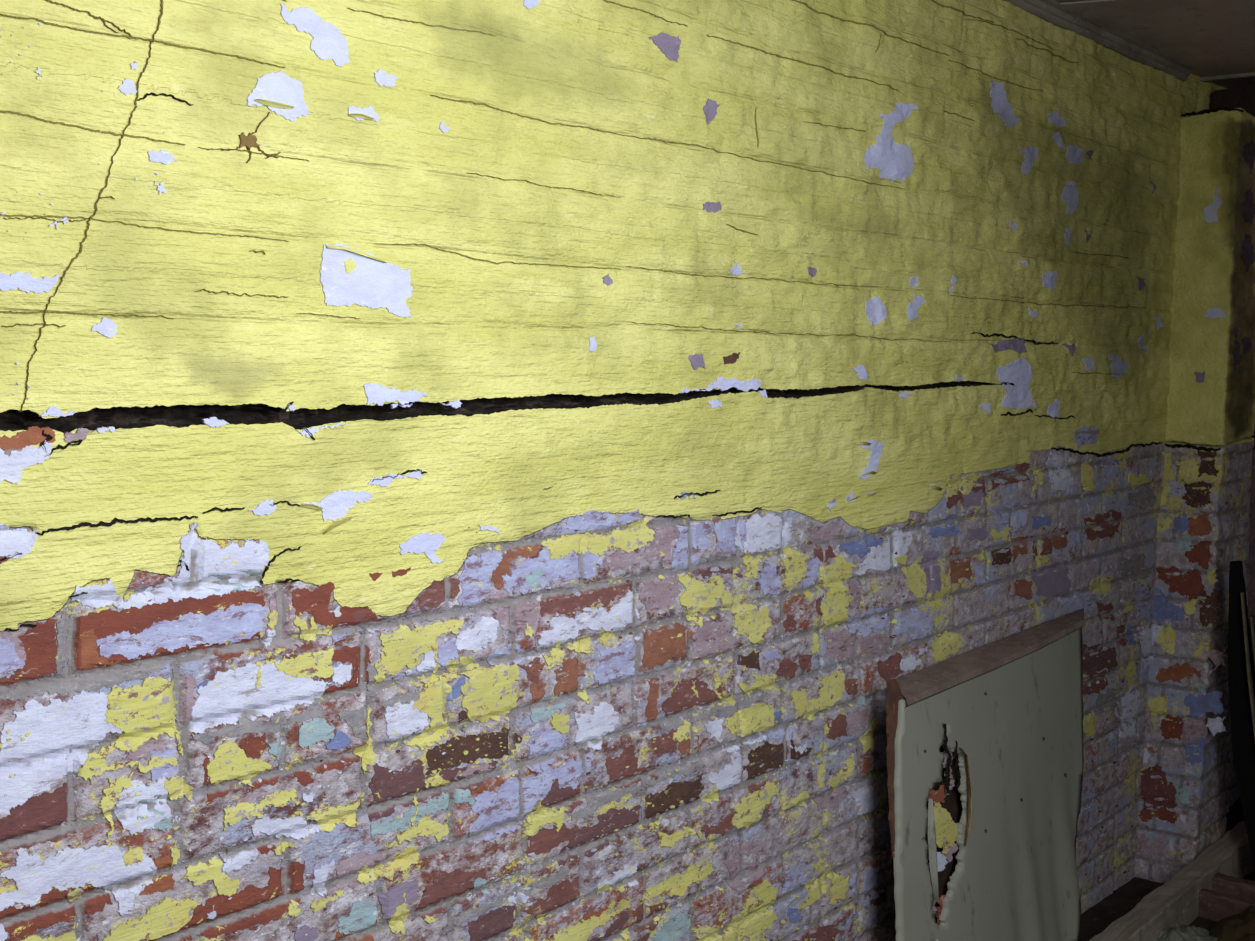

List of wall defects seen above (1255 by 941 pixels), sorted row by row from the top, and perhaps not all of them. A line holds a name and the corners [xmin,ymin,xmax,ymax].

peeling [280,4,349,67]
peeling [247,71,311,121]
peeling [989,81,1020,128]
peeling [864,102,919,182]
crack [0,0,1221,457]
peeling [319,243,413,318]
peeling [363,383,428,406]
peeling [979,337,1060,418]
crack [0,501,301,567]
crack [260,546,301,584]
peeling [0,424,1227,941]